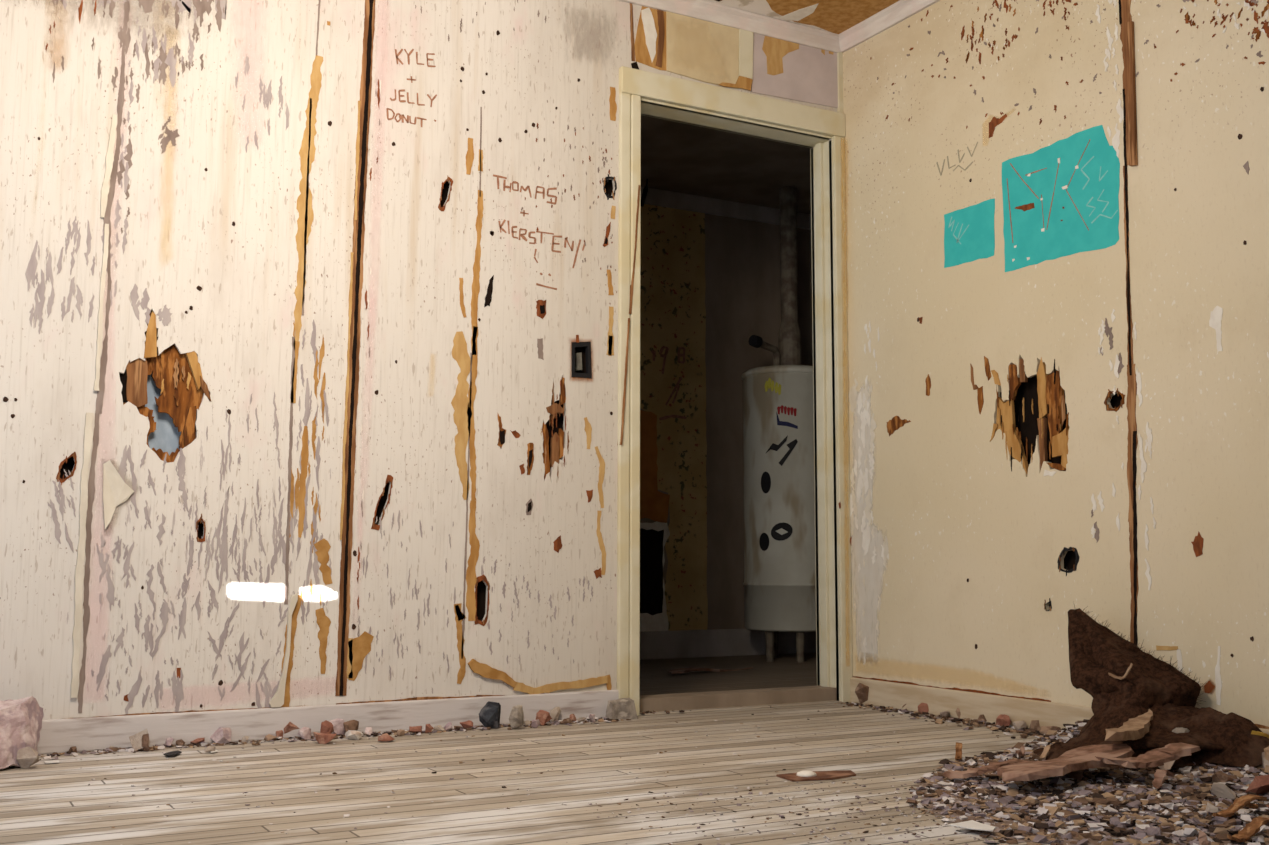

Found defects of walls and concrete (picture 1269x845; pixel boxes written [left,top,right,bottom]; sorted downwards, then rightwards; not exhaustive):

spalling [1176,0,1269,65]
peeling [466,138,483,175]
spalling [440,181,450,207]
peeling [91,55,332,714]
peeling [347,190,606,684]